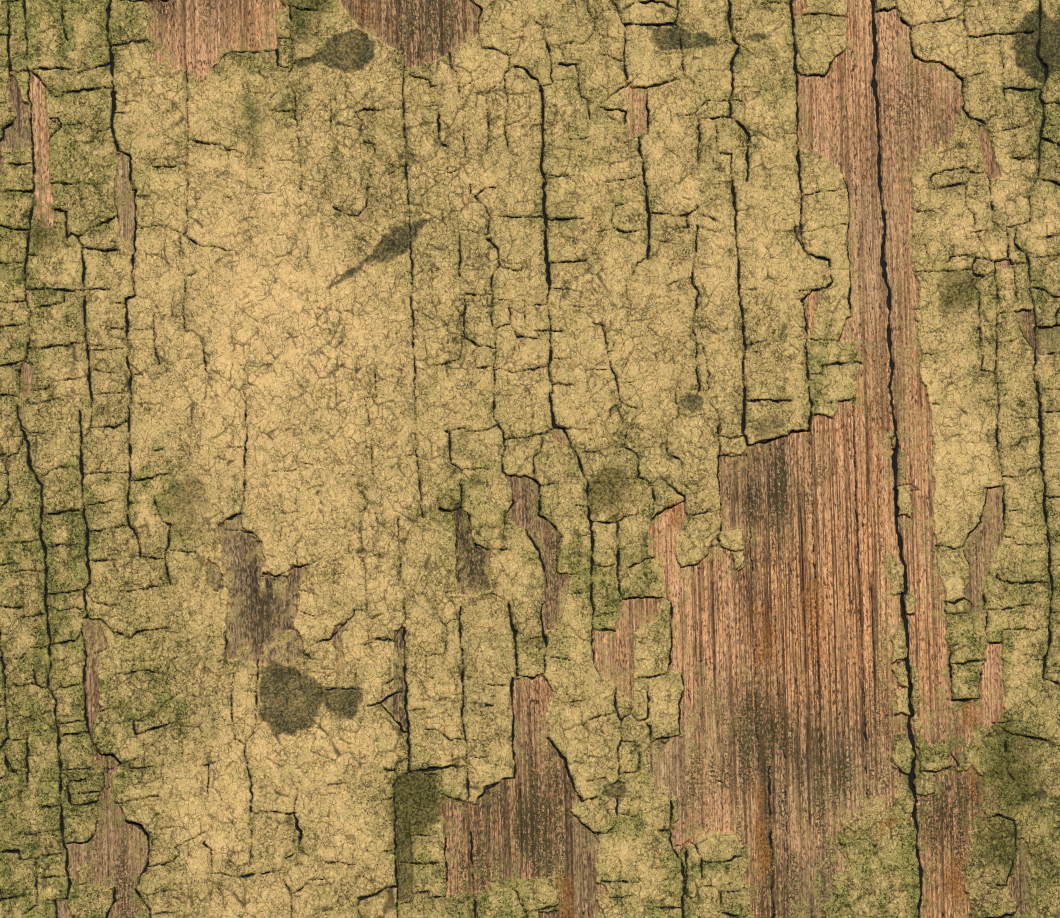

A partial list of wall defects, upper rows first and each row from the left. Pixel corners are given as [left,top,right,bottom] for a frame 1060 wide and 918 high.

peeling [141,0,291,91]
water stain [297,29,374,72]
peeling [335,0,486,72]
water stain [1015,10,1060,82]
water stain [329,218,430,289]
peeling [586,0,1009,918]
crack [838,0,1060,918]
peeling [201,509,314,669]
water stain [259,662,361,734]
peeling [50,614,155,918]
peeling [390,672,612,918]